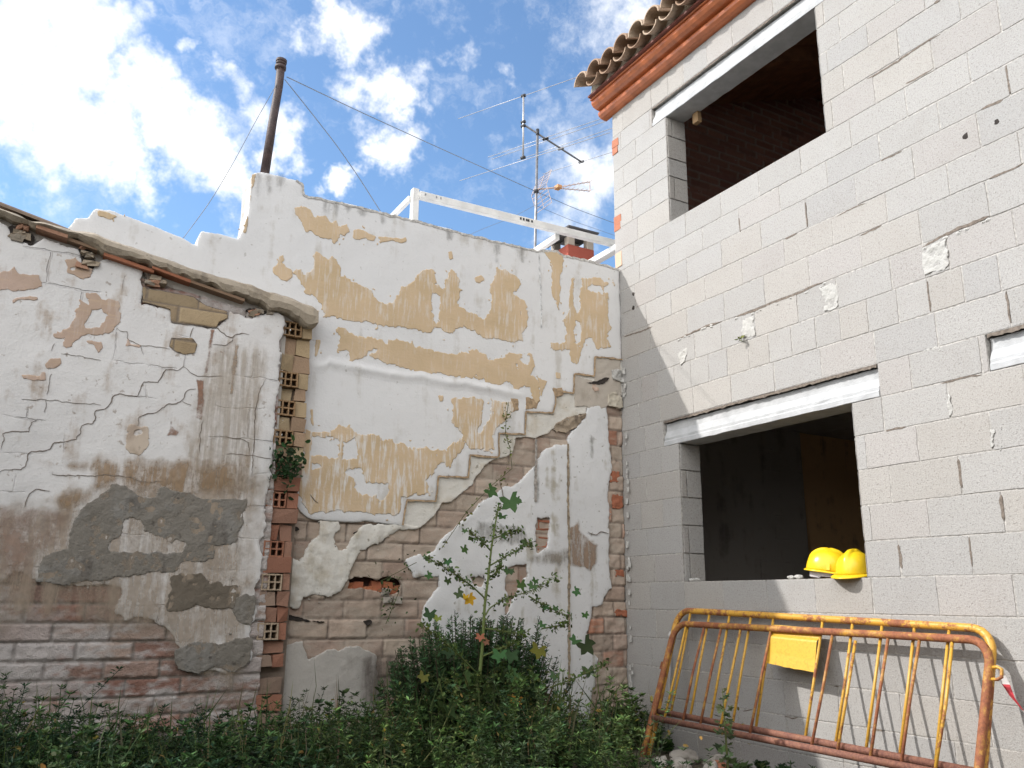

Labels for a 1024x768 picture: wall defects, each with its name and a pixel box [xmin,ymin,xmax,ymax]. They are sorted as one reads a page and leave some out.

peeling [0,267,42,303]
peeling [22,293,121,381]
peeling [65,257,93,280]
flaking render [142,287,228,354]
peeling [544,252,615,364]
crack [0,328,213,507]
crack [226,382,271,477]
flaking render [273,206,573,746]
damp [0,492,82,614]
damp [79,459,254,650]
flaking render [586,406,629,715]